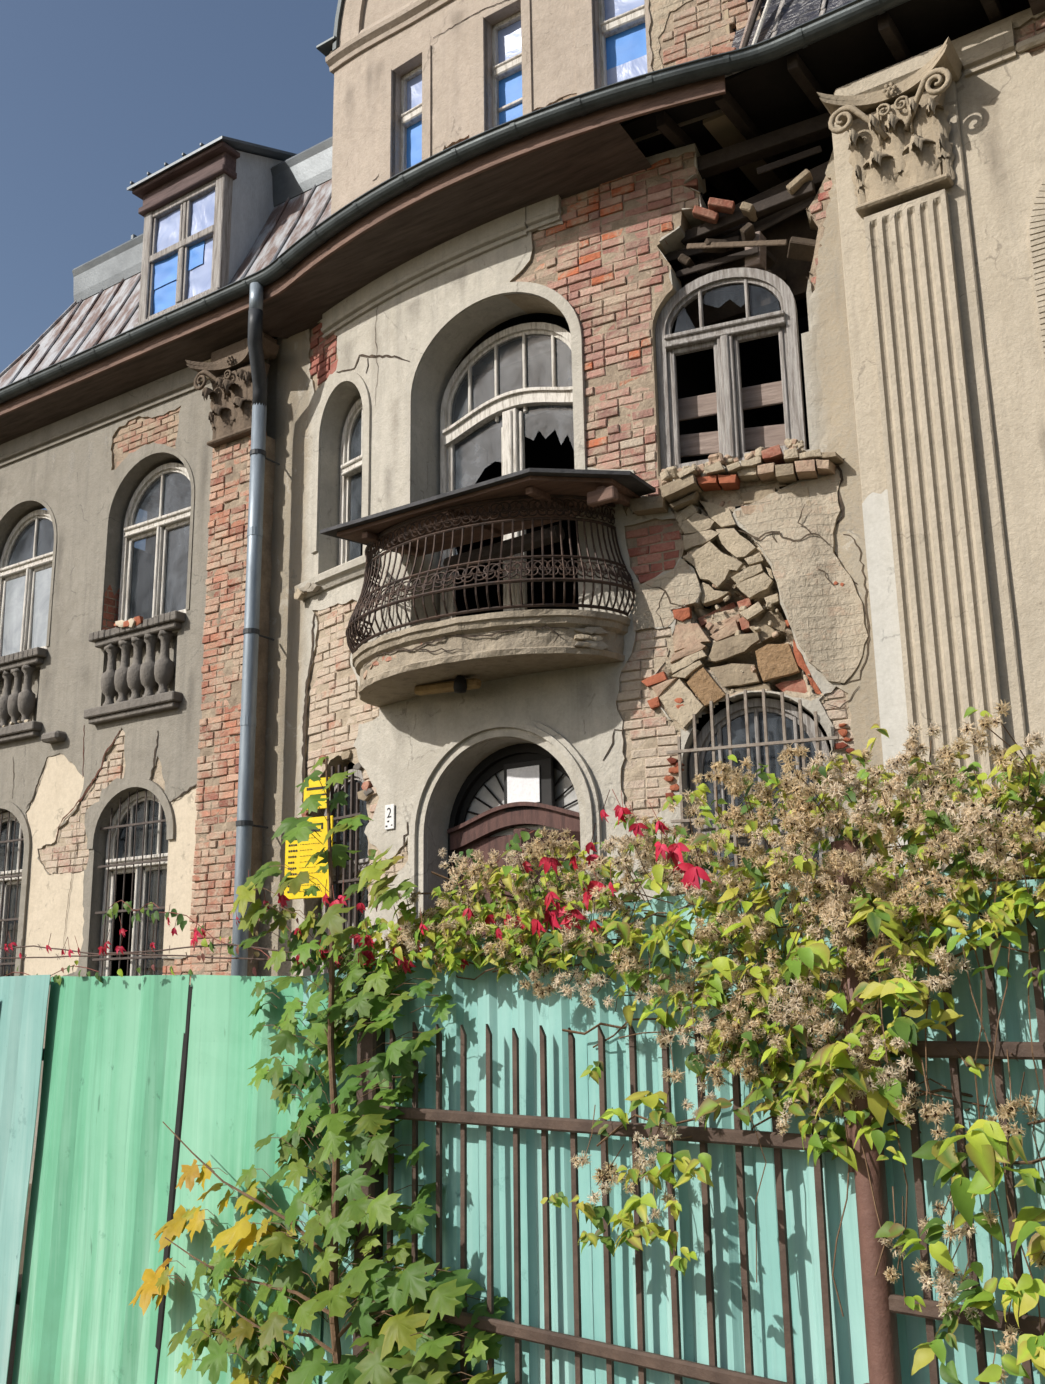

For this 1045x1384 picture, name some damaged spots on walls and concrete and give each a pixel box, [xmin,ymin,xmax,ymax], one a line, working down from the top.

flaking render [648,0,762,71]
flaking render [111,406,181,470]
flaking render [308,322,338,394]
crack [337,305,410,402]
crack [646,584,688,629]
flaking render [504,151,854,832]
crack [739,465,870,709]
crack [301,614,315,817]
flaking render [294,582,408,907]
peeling [22,728,126,976]
peeling [151,756,198,985]